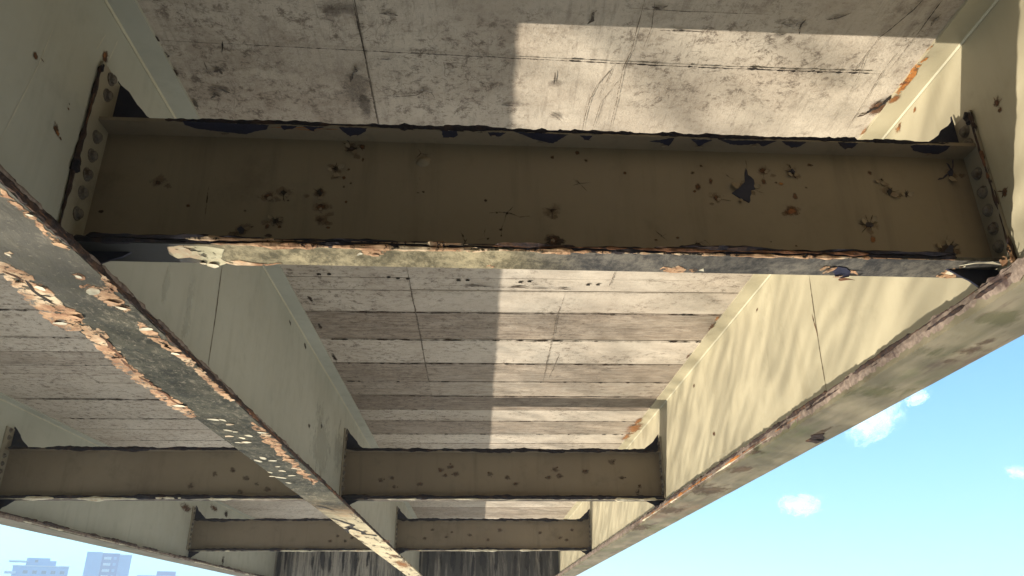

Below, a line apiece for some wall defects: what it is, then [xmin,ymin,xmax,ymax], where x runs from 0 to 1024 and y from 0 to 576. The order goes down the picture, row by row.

rust [889,46,933,103]
rust [59,64,105,225]
peeling [182,121,323,135]
peeling [339,127,367,161]
peeling [488,132,566,144]
peeling [714,164,762,203]
peeling [691,139,806,149]
rust [963,112,1008,209]
peeling [167,215,610,268]
peeling [625,252,901,273]
peeling [0,251,318,493]
rust [0,164,1024,576]